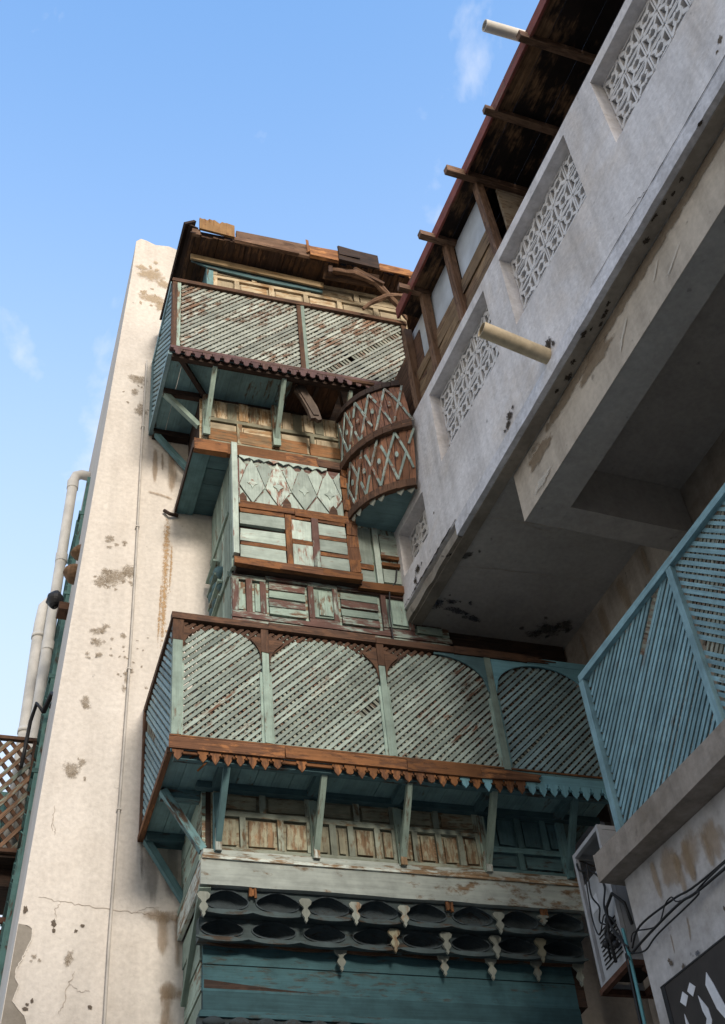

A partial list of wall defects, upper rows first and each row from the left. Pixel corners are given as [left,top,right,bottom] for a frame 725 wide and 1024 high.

damp [528,128,725,472]
damp [94,565,134,590]
corrosion [158,519,172,641]
spalling [1,906,40,1024]
crack [44,897,173,920]